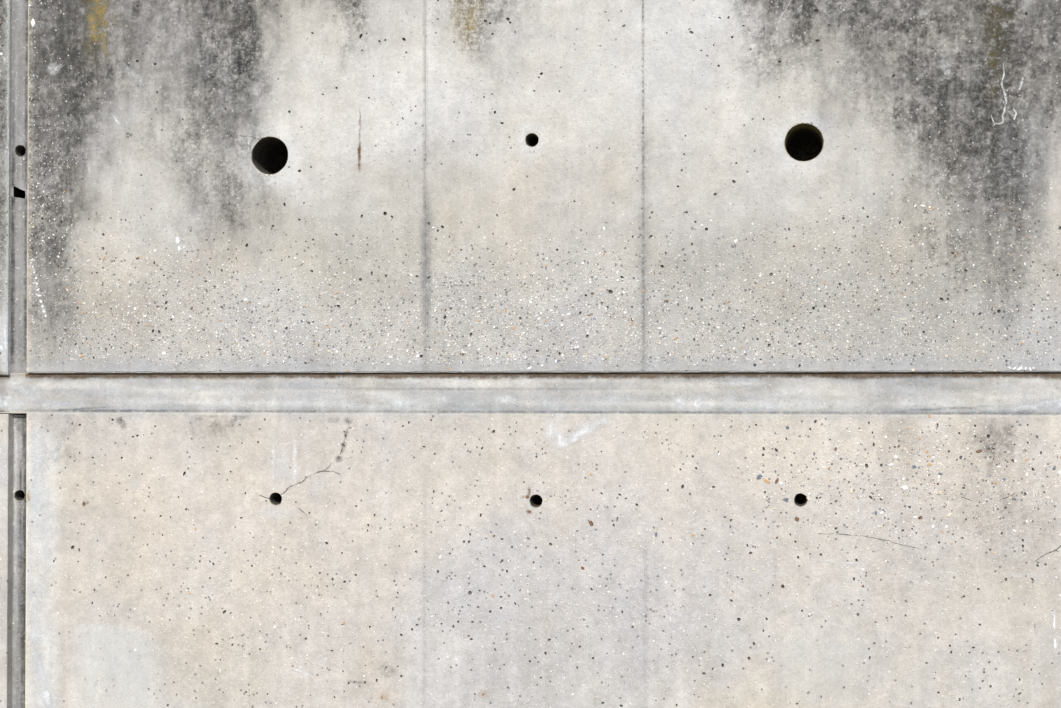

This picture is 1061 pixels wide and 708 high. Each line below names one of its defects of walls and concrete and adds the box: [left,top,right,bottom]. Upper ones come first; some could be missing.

leakage [200,0,255,90]
leakage [768,0,816,46]
leakage [851,0,1061,211]
leakage [0,0,130,311]
crack [260,428,349,515]